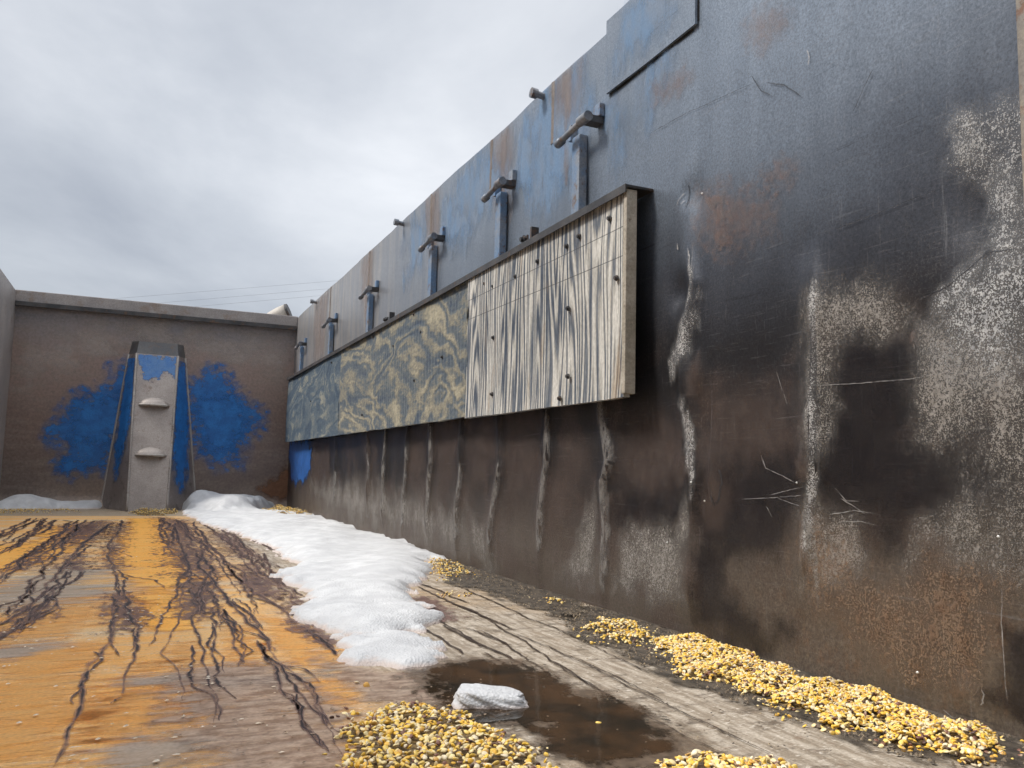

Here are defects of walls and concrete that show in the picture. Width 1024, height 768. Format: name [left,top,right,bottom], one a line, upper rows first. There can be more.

peeling [40,354,269,493]